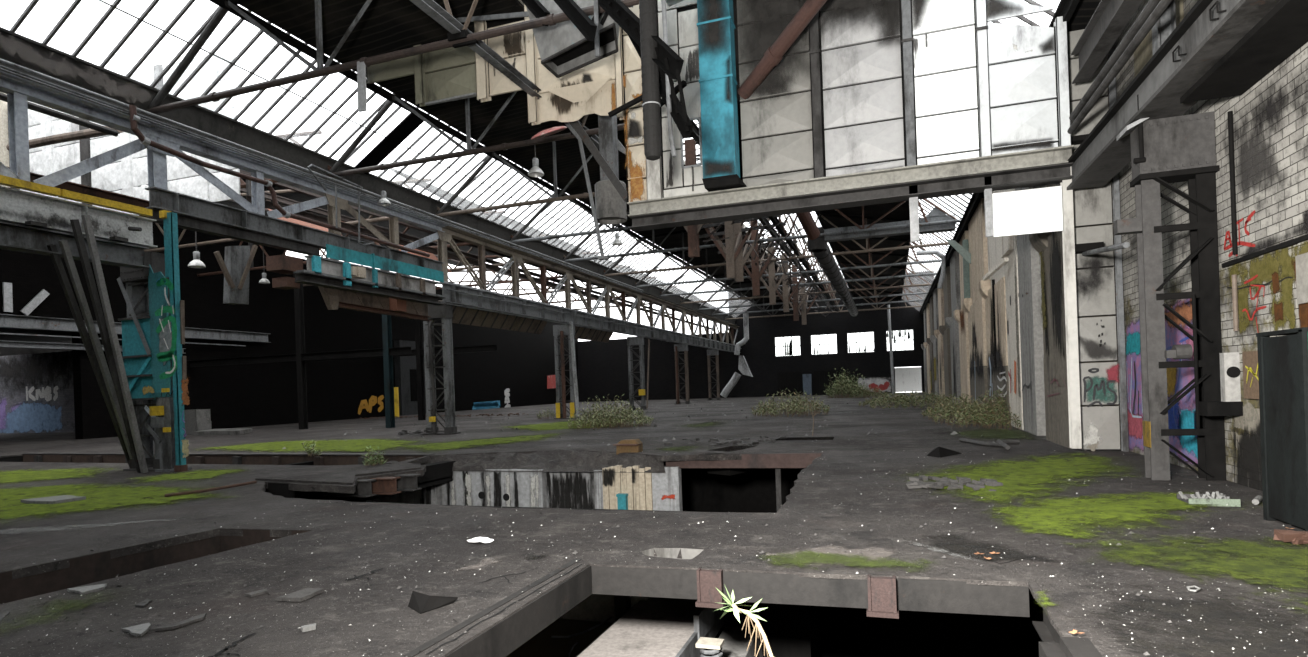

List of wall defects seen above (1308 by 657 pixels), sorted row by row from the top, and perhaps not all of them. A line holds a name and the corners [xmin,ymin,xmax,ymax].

rust [611,75,644,202]